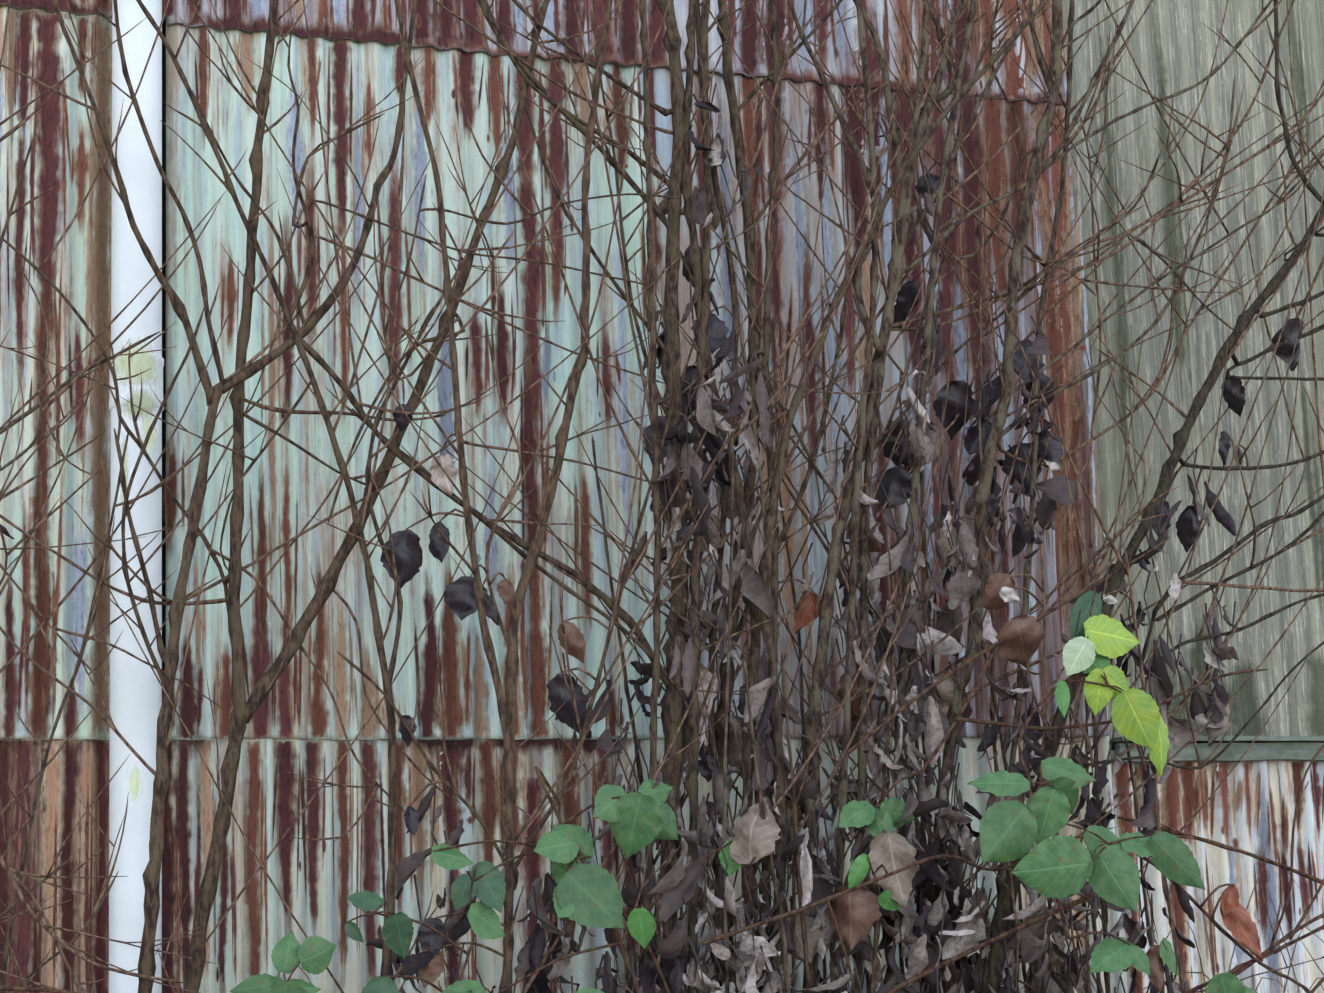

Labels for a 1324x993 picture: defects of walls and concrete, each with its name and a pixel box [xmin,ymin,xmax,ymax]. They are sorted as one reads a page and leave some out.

corrosion [690,97,714,194]
corrosion [0,0,112,993]
corrosion [162,0,668,993]
corrosion [1130,965,1143,993]
corrosion [1169,853,1219,983]
corrosion [1112,761,1324,932]